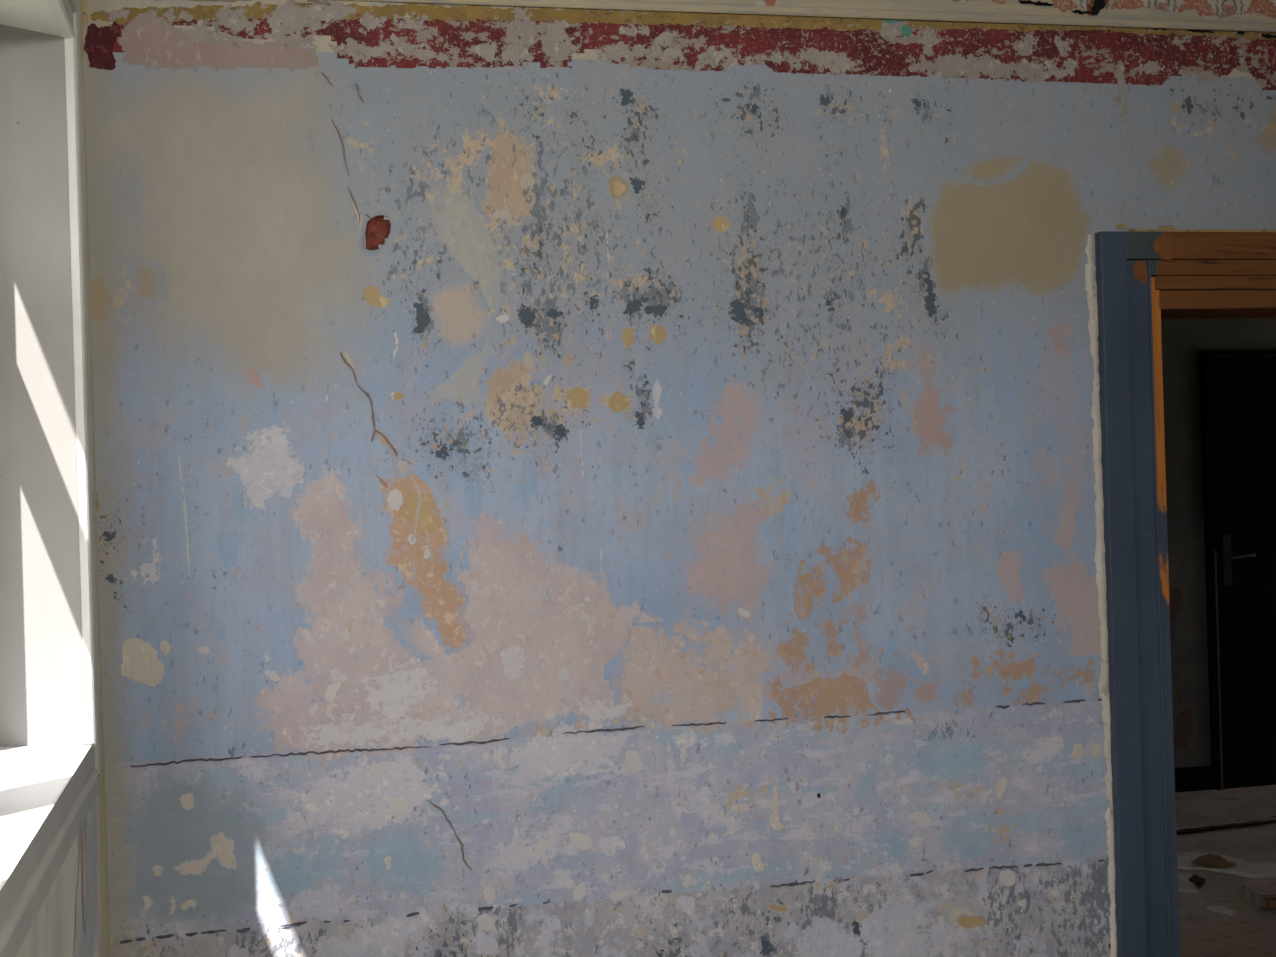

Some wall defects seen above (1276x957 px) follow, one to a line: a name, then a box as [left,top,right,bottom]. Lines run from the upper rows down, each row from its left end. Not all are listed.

peeling [149,0,860,76]
peeling [880,21,1078,84]
peeling [1112,59,1228,107]
flaking render [472,118,545,230]
spalling [356,204,401,259]
crack [340,352,398,457]
peeling [108,406,823,957]
crack [131,738,510,767]
crack [563,718,788,734]
crack [965,863,1062,872]
crack [120,927,250,944]
crack [280,919,350,927]